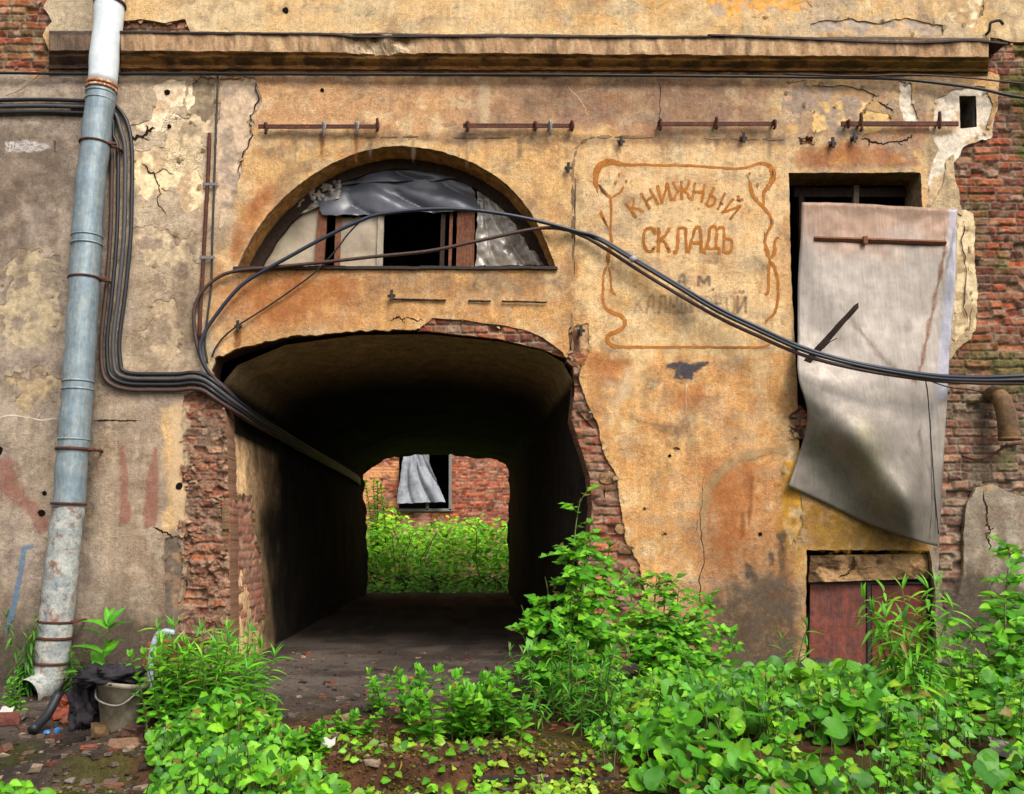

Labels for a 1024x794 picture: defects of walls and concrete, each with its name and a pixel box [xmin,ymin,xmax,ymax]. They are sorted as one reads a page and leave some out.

flaking render [0,0,52,72]
crack [133,125,175,214]
peeling [129,75,262,230]
crack [235,83,260,180]
crack [861,134,913,148]
flaking render [780,38,1024,610]
flaking render [161,386,266,677]
flaking render [418,318,653,668]
crack [696,478,705,602]
crack [983,490,994,550]